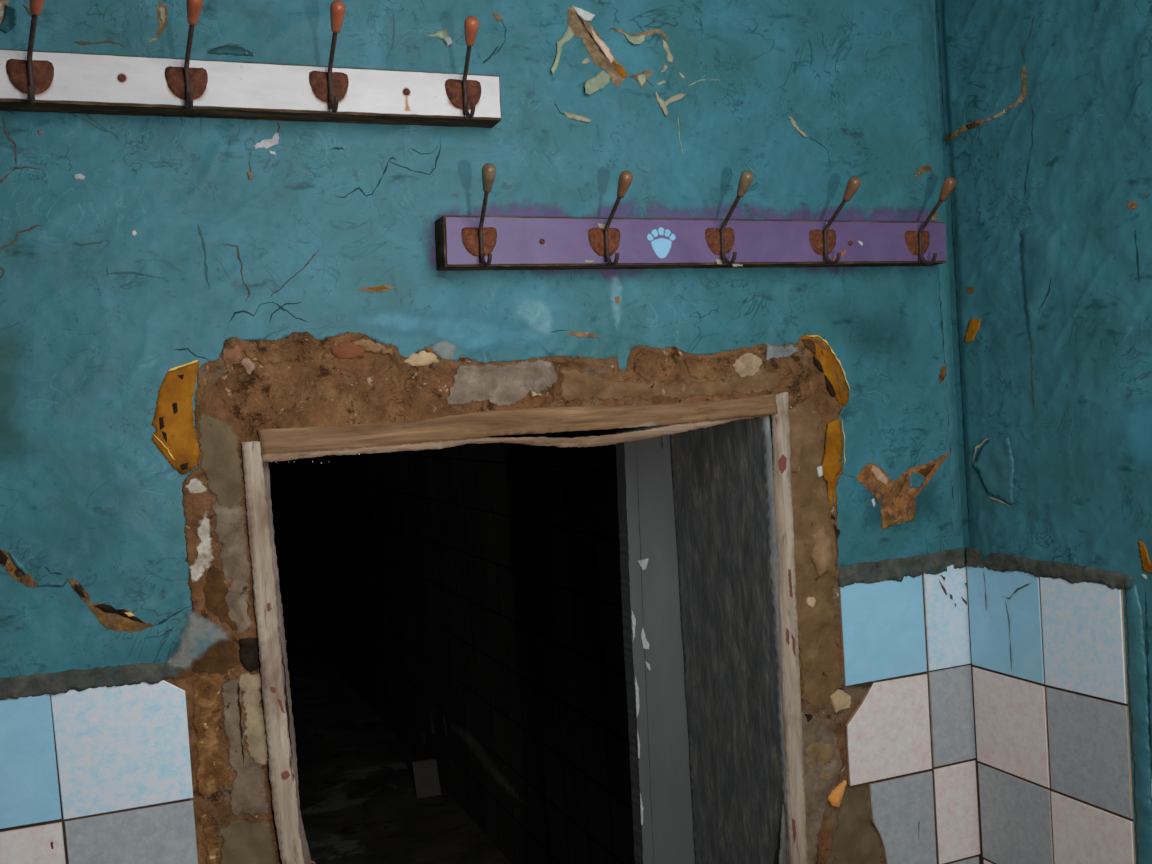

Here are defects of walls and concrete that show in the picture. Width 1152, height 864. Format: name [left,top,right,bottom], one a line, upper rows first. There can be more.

peeling [551,6,686,116]
peeling [555,104,591,122]
peeling [549,330,598,338]
peeling [857,452,952,529]
crack [40,567,68,587]
spalling [152,332,885,864]
crack [146,604,193,638]